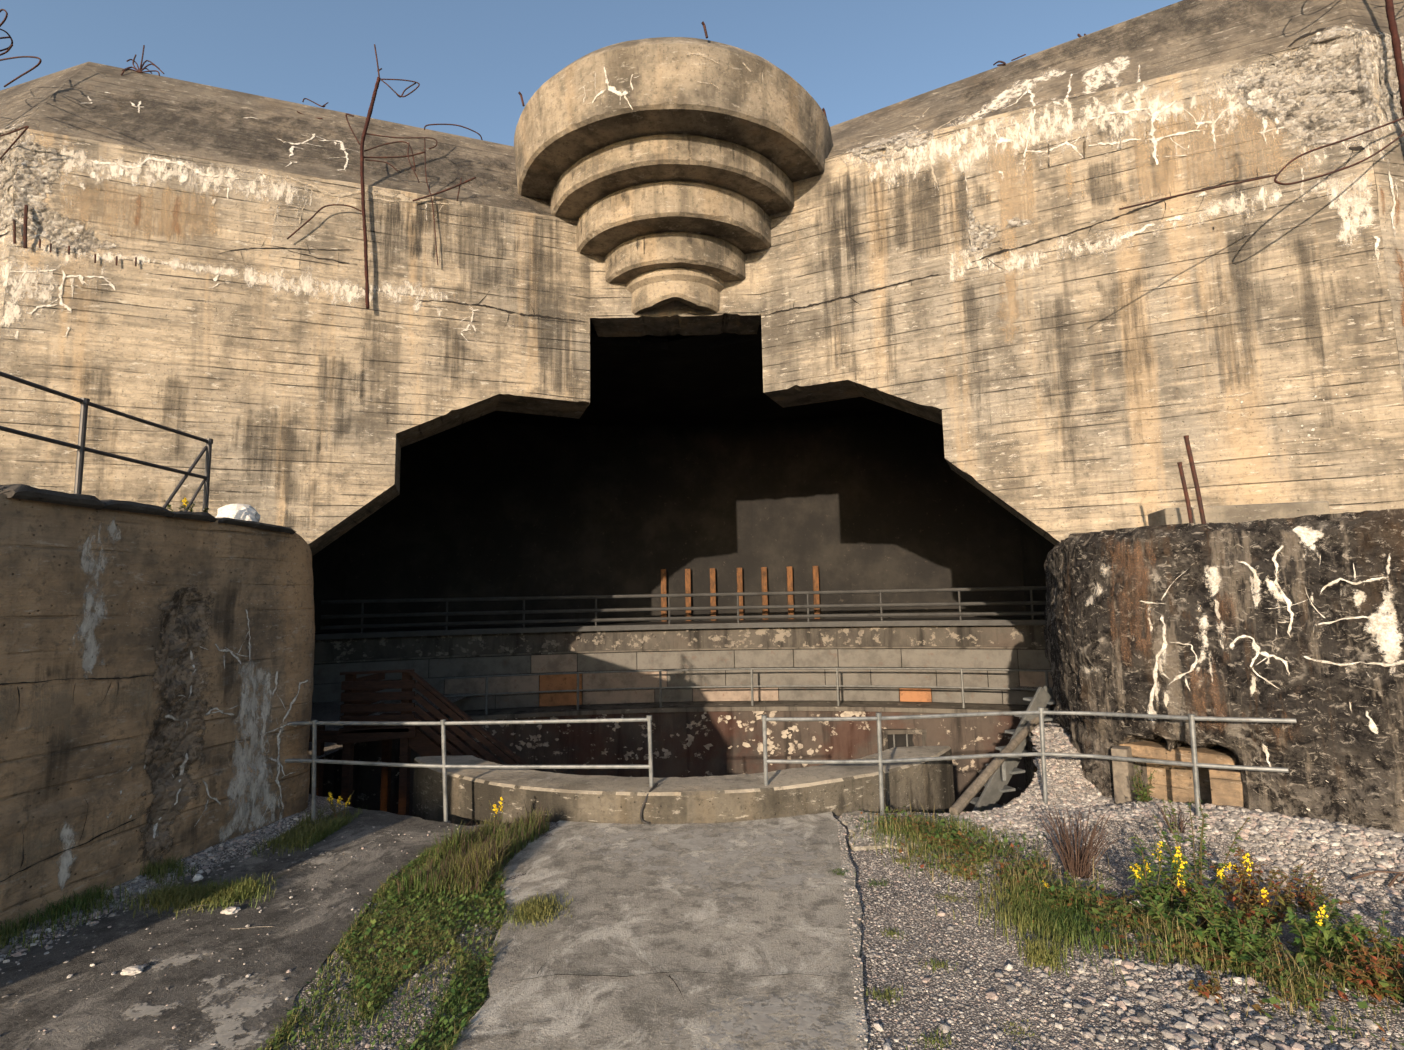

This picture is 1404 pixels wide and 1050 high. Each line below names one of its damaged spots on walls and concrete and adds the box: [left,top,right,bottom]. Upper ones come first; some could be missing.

rust [0,126,29,160]
rust [0,9,42,87]
spalling [0,121,449,316]
crack [969,100,1266,274]
damp [868,57,1404,331]
rust [1119,0,1404,210]
spalling [1222,25,1404,172]
crack [769,274,938,315]
damp [1196,566,1225,682]
damp [1238,526,1324,636]
damp [1353,585,1403,664]
peeling [601,711,829,767]